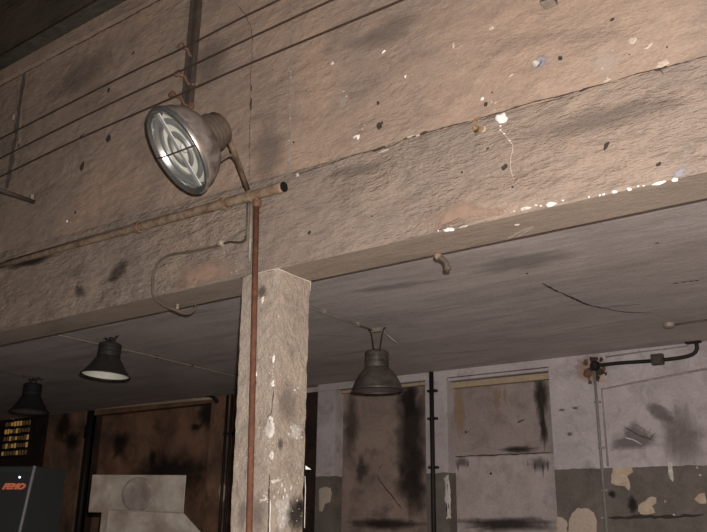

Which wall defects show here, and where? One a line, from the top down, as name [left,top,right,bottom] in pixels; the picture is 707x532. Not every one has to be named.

crack [292,56,706,177]
crack [542,283,643,313]
leakage [401,388,415,412]
peeling [263,416,277,468]
peeling [288,424,304,440]
leakage [400,462,423,504]
peeling [611,466,633,491]
peeling [638,497,666,515]
peeling [556,508,603,532]